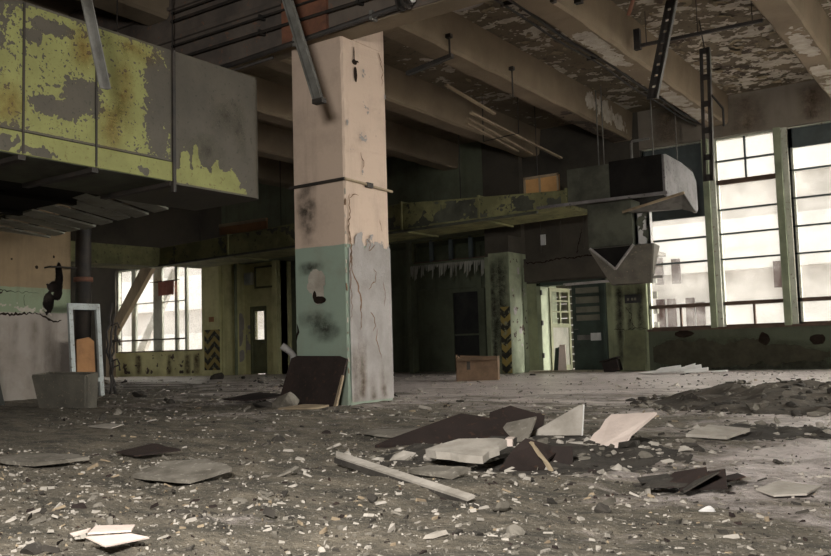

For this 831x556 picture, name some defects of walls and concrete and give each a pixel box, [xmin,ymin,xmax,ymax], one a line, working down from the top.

peeling [453,1,718,142]
peeling [617,0,831,97]
peeling [0,133,61,160]
peeling [388,199,487,230]
crack [0,289,61,322]
spalling [0,255,64,316]
crack [348,194,386,354]